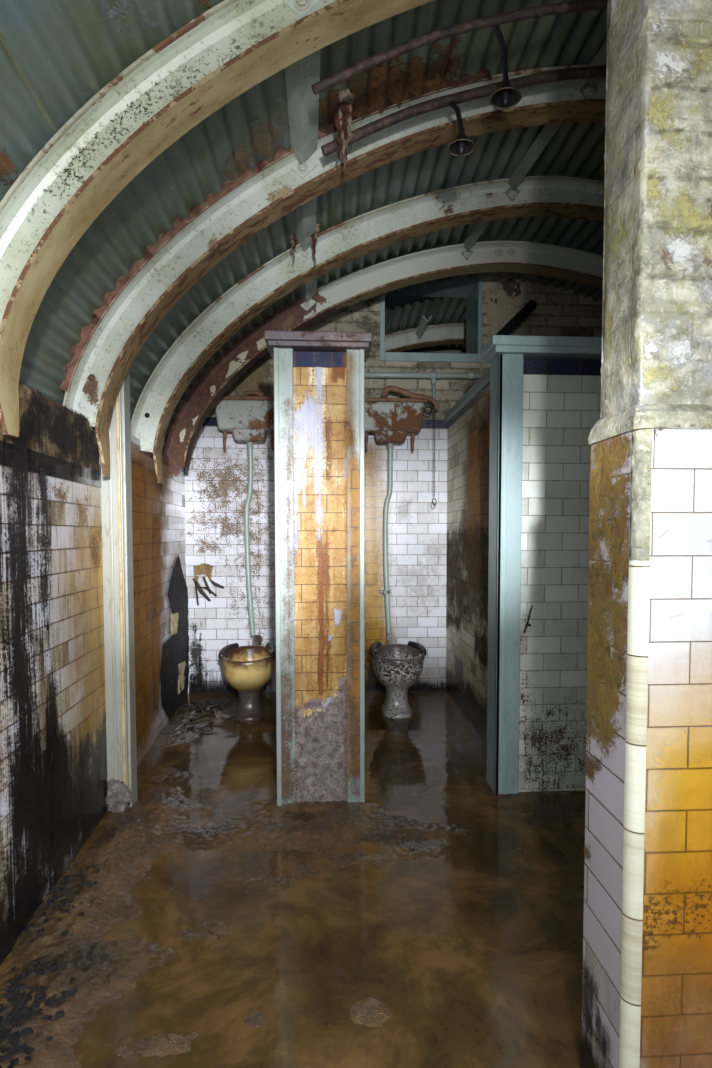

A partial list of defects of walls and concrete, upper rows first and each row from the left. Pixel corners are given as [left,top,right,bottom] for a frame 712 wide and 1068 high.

rust [318,37,470,171]
rust [82,375,101,408]
damp [0,390,108,966]
damp [186,441,275,645]
rust [281,364,360,801]
spalling [295,676,347,802]
peeling [328,608,342,640]
damp [641,715,712,978]